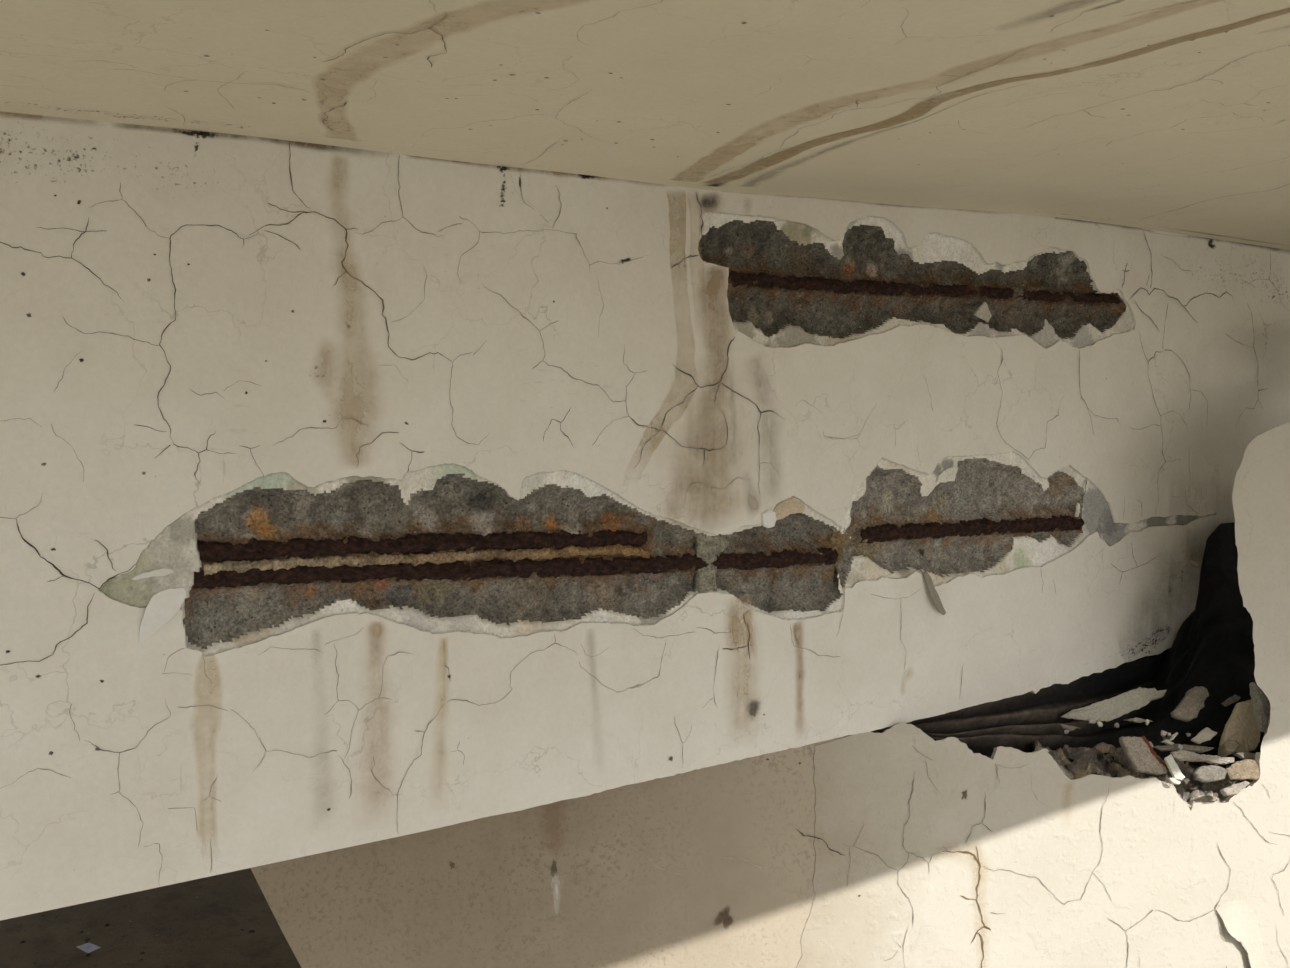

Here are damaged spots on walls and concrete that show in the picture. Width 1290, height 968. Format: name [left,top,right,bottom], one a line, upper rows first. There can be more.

damp [669,8,1290,255]
crack [0,1,933,503]
damp [705,270,723,313]
spalling [698,211,1134,349]
rust [728,270,1121,304]
crack [0,493,134,665]
rust [193,529,839,590]
spalling [98,451,1215,656]
rust [860,515,1085,544]
crack [69,610,750,886]
crack [797,746,1231,968]
spalling [1033,735,1253,807]